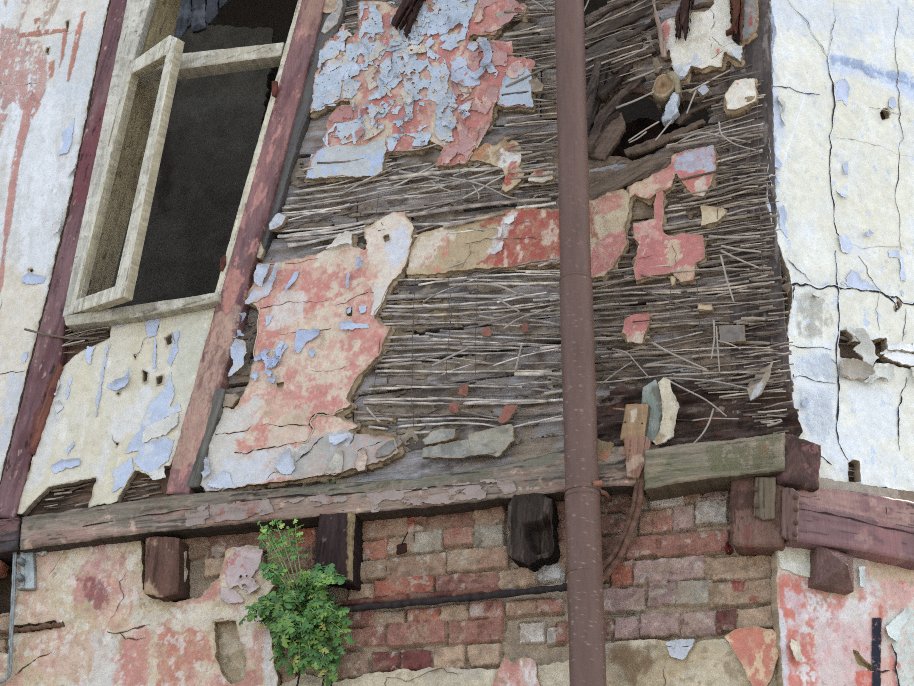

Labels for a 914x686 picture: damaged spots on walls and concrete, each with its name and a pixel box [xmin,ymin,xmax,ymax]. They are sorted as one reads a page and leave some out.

peeling [269,0,559,254]
spalling [585,0,809,443]
crack [773,0,914,465]
spalling [0,481,96,532]
spalling [24,324,130,420]
peeling [112,331,182,503]
peeling [201,457,237,489]
spalling [223,393,240,409]
peeling [228,242,320,383]
crack [83,409,501,527]
spalling [324,258,563,477]
peeling [846,326,914,384]